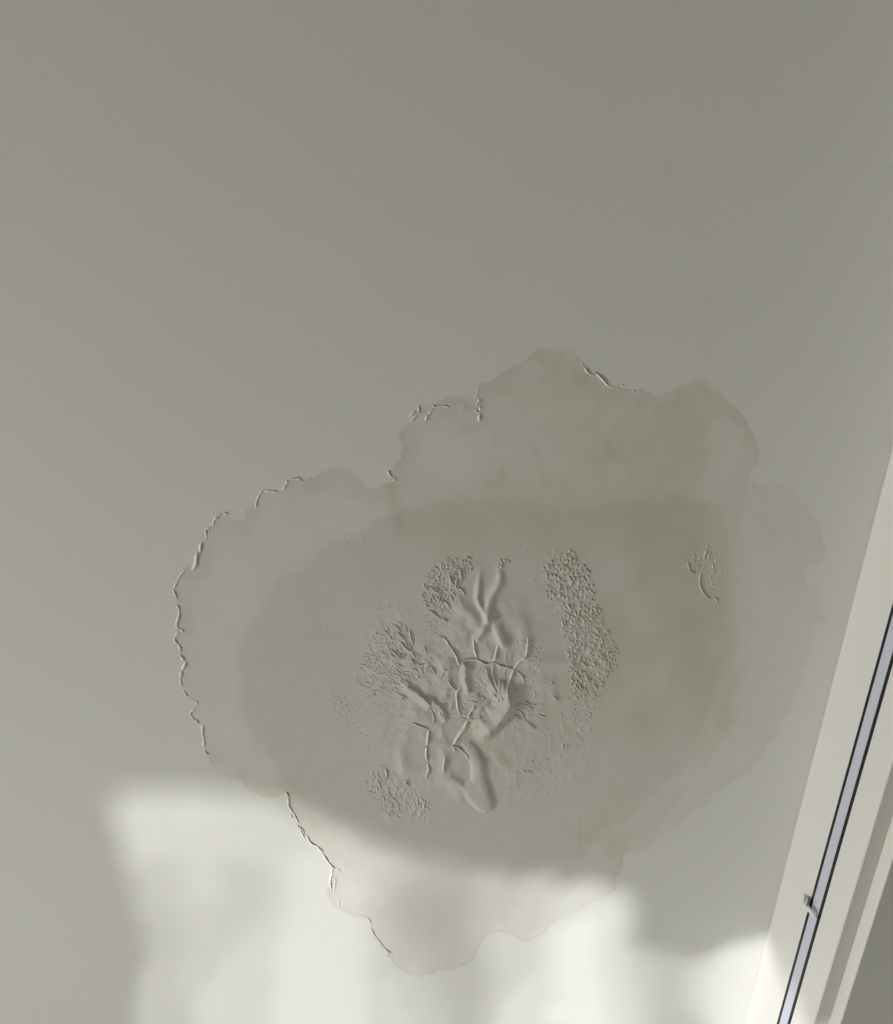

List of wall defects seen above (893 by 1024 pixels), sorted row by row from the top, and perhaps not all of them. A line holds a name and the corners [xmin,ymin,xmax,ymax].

peeling [173,512,228,755]
crack [413,636,529,779]
water stain [171,227,833,979]